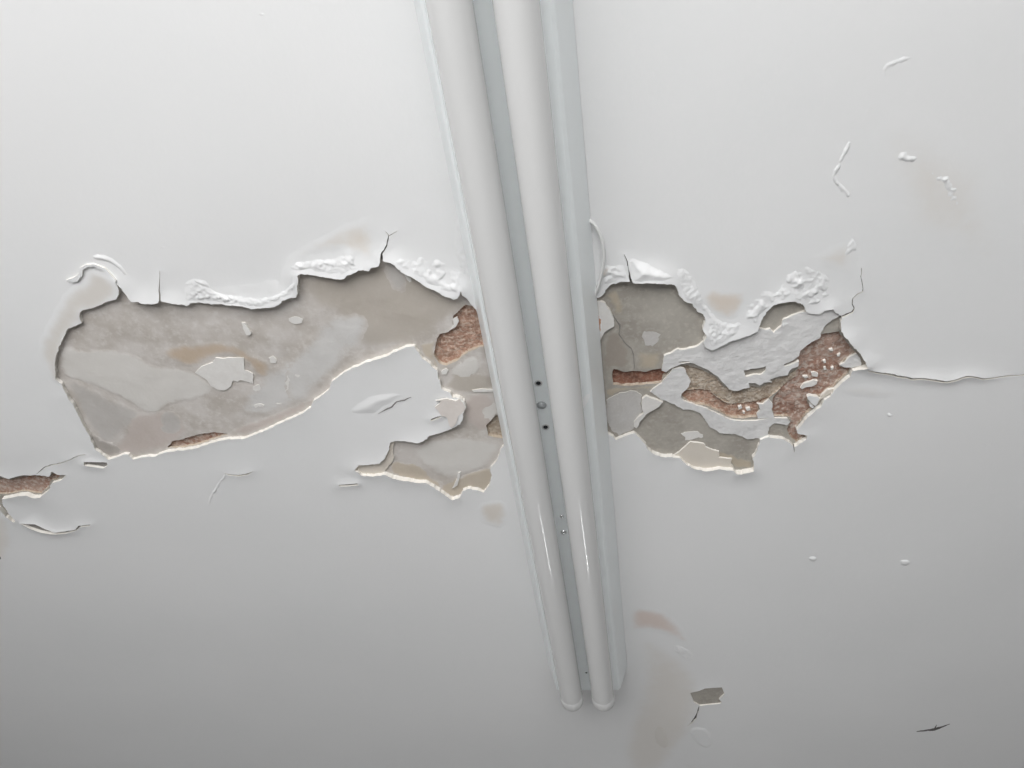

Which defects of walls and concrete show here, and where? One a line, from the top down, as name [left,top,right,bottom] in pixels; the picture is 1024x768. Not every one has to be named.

spalling [38,260,504,497]
spalling [597,280,866,470]
spalling [0,472,65,515]
spalling [691,687,724,704]